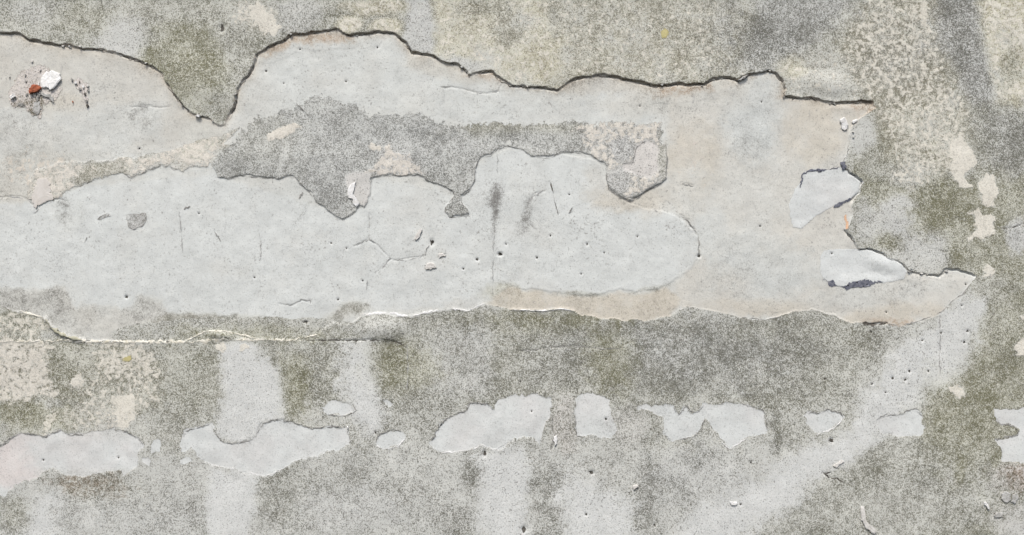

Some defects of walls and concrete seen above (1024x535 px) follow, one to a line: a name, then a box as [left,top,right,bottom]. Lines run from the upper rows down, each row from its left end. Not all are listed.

peeling [0,27,976,341]
peeling [0,427,161,497]
peeling [180,400,356,476]
peeling [374,429,406,449]
peeling [429,381,557,455]
peeling [573,392,618,439]
peeling [637,402,768,449]
peeling [804,409,845,442]
peeling [876,408,926,437]
peeling [993,407,1024,463]
spalling [860,506,877,534]